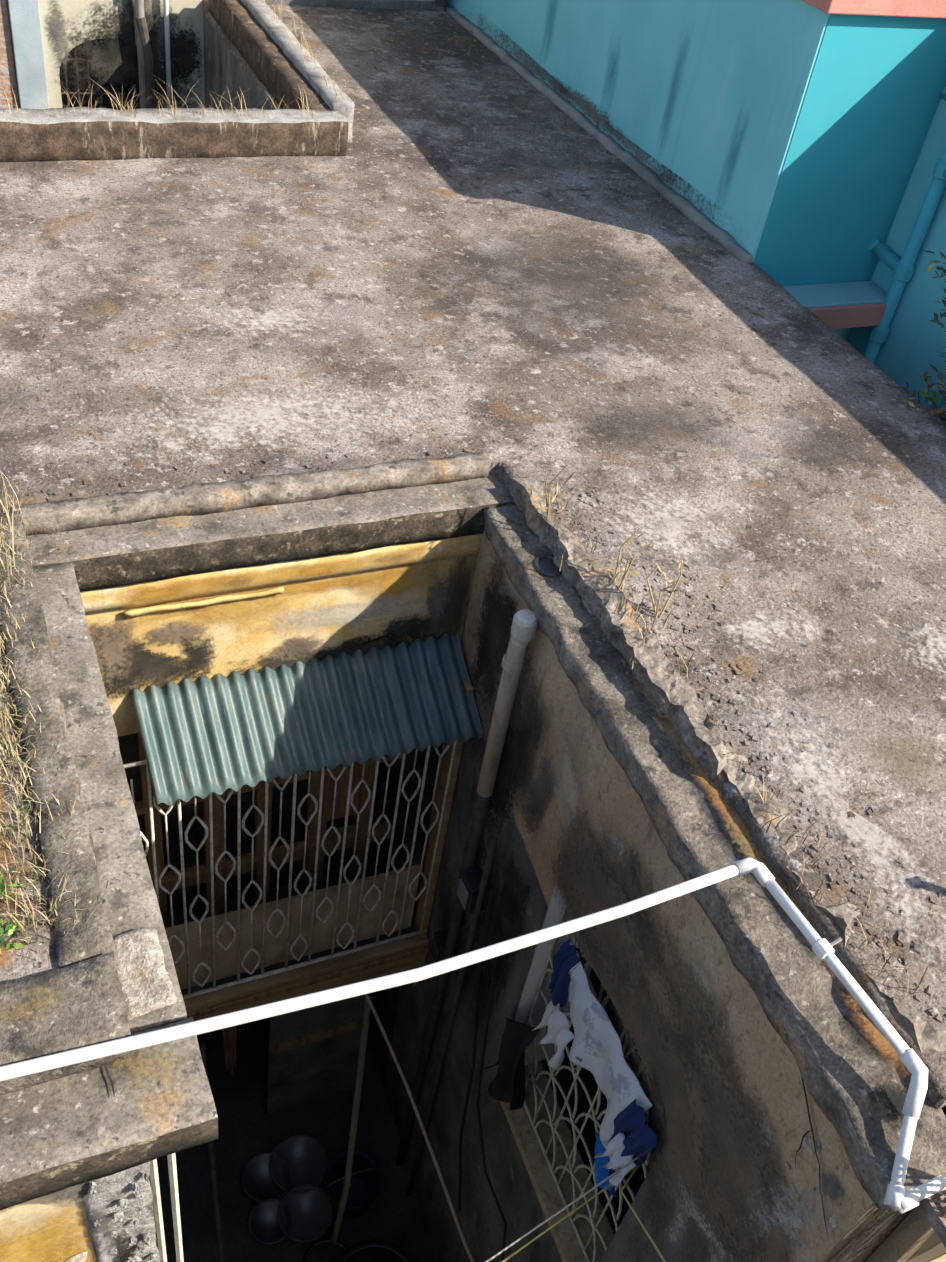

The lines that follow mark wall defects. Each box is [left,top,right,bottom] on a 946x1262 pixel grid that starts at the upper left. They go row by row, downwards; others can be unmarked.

leakage [46,1,202,108]
leakage [479,16,715,212]
leakage [91,620,216,698]
leakage [230,556,517,763]
leakage [457,645,553,1020]
leakage [0,1179,98,1262]
spalling [65,1172,159,1262]
leakage [94,1211,150,1262]